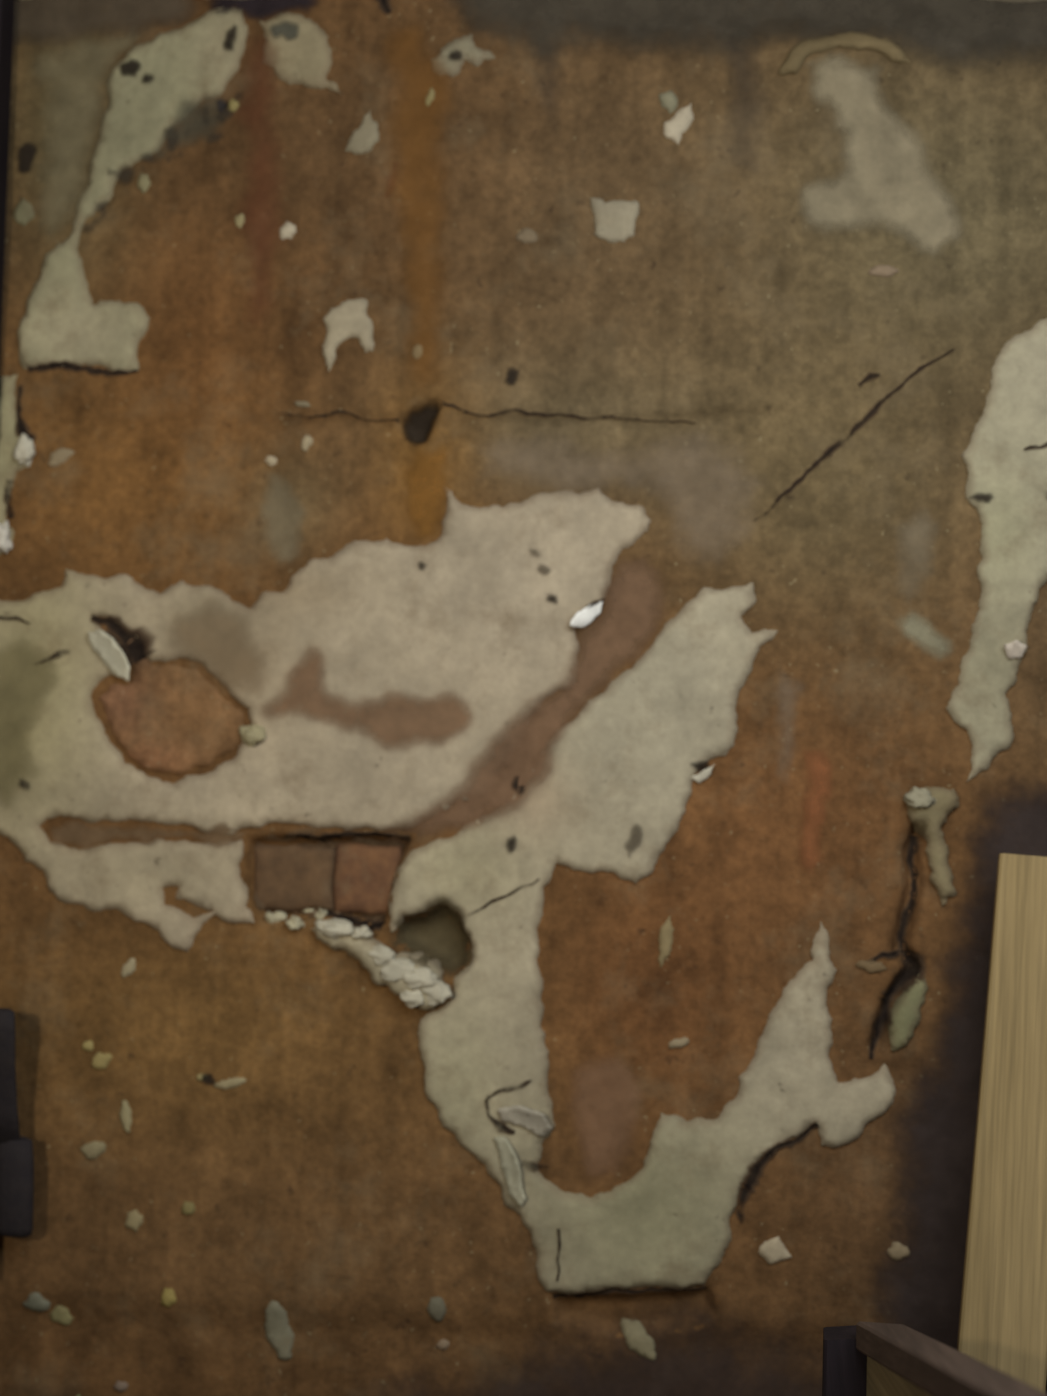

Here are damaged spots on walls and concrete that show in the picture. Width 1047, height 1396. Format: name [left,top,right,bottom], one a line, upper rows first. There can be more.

flaking render [590,197,639,243]
flaking render [0,7,342,555]
flaking render [322,298,375,371]
crack [15,360,138,441]
crack [281,410,399,422]
crack [442,402,695,423]
crack [755,348,955,520]
crack [4,479,14,519]
flaking render [903,318,1047,907]
flaking render [0,487,928,1295]
crack [868,835,925,1059]